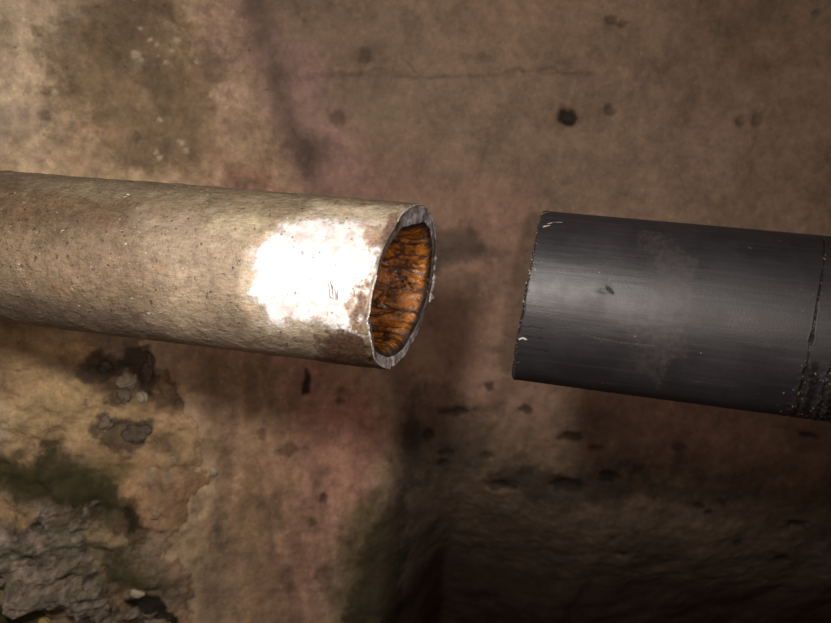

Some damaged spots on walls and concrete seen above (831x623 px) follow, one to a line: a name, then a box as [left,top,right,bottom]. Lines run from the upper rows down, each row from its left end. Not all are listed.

damp [57,480,145,544]
spalling [0,321,211,623]